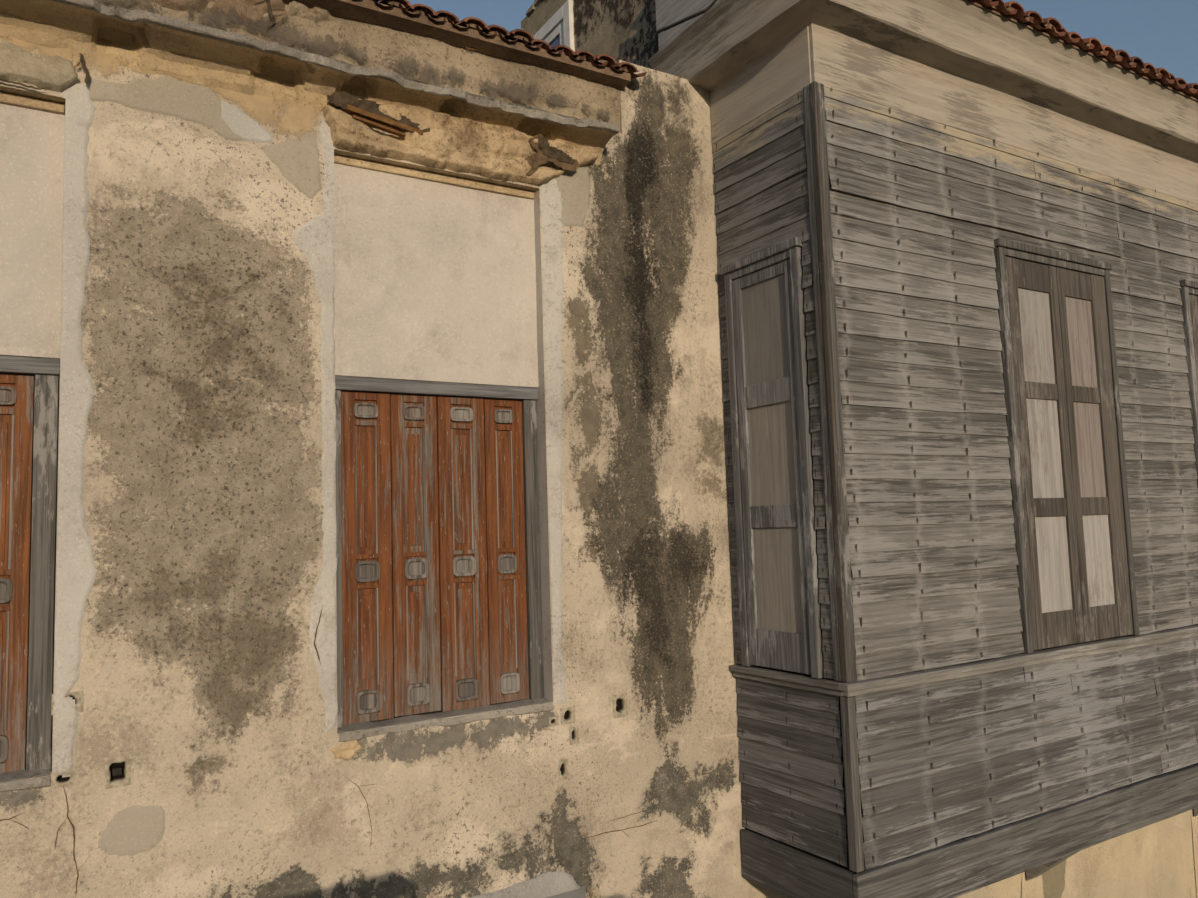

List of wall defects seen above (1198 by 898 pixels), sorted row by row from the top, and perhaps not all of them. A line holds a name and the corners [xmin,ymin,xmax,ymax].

flaking render [80,185,324,744]
leakage [565,69,737,838]
crack [0,783,79,898]
leakage [207,786,603,898]
leakage [631,851,707,898]